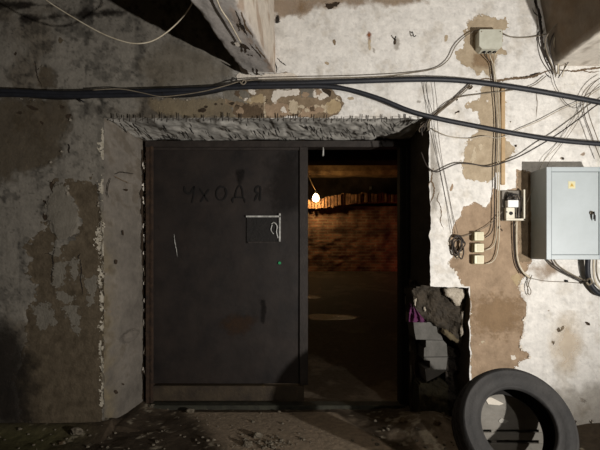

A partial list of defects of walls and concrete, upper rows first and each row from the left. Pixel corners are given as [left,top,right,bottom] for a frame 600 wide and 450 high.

peeling [20,174,107,423]
peeling [113,89,426,141]
peeling [448,14,532,379]
crack [479,0,600,82]